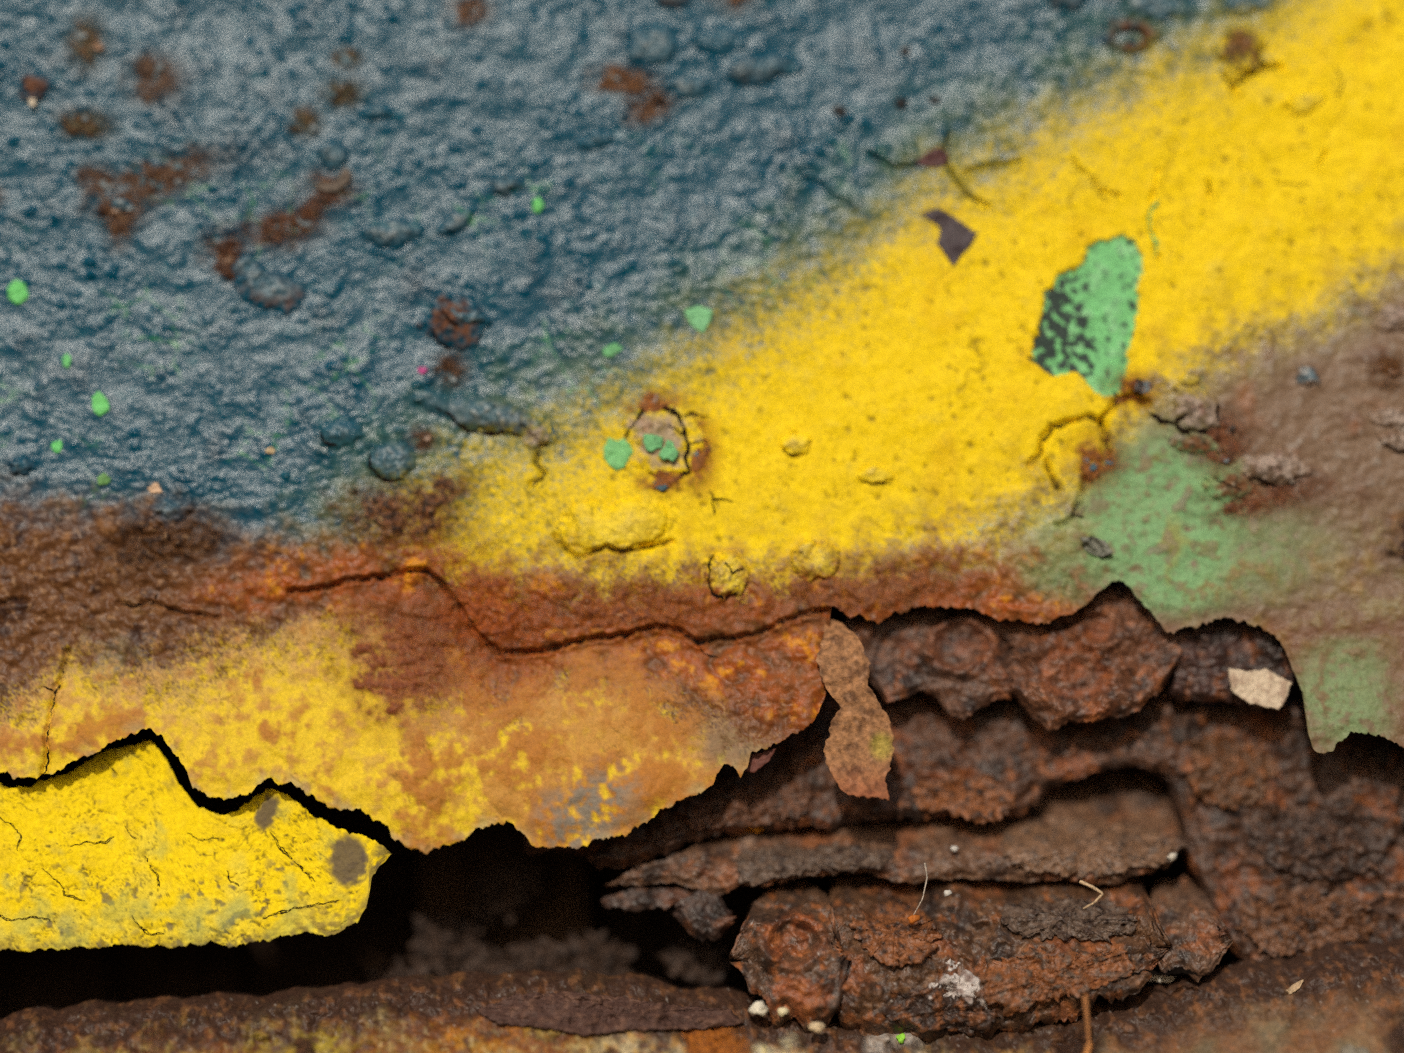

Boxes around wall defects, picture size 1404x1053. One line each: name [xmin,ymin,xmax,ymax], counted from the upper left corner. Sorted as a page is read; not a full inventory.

crack [1030,391,1147,525]
rust [352,475,467,542]
rust [350,571,529,727]
crack [290,570,829,657]
peeling [1228,668,1292,710]
rust [683,774,816,831]
peeling [744,748,776,773]
rust [730,841,895,887]
rust [911,772,1177,880]
rust [1182,730,1404,958]
peeling [600,885,737,942]
rust [882,893,1138,1037]